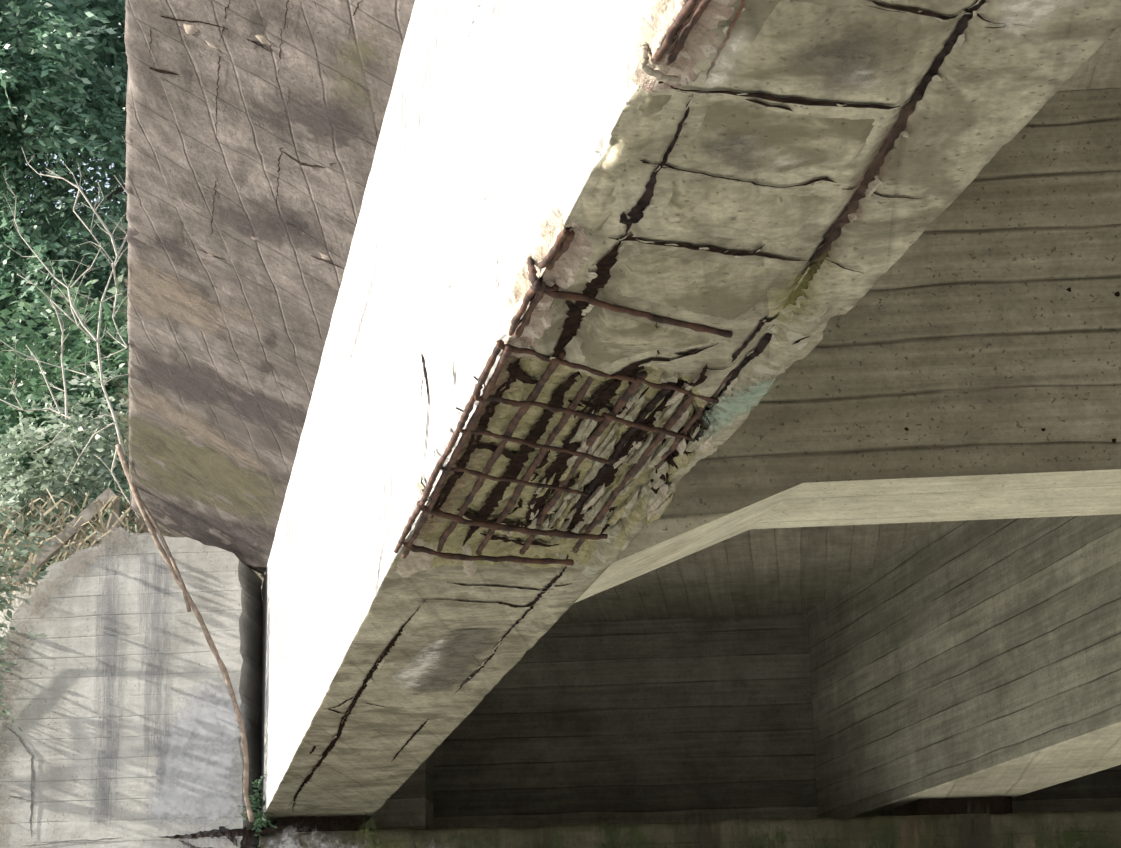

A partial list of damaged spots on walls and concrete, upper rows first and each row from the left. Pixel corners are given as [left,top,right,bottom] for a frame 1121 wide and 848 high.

crack [149,0,290,143]
spalling [632,0,737,93]
leakage [130,268,218,330]
crack [416,257,499,503]
spalling [394,210,830,579]
crack [549,0,1034,406]
leakage [120,351,307,726]
crack [4,725,123,847]
leakage [0,527,167,816]
leakage [268,833,341,848]
crack [164,551,572,848]
leakage [397,629,495,695]